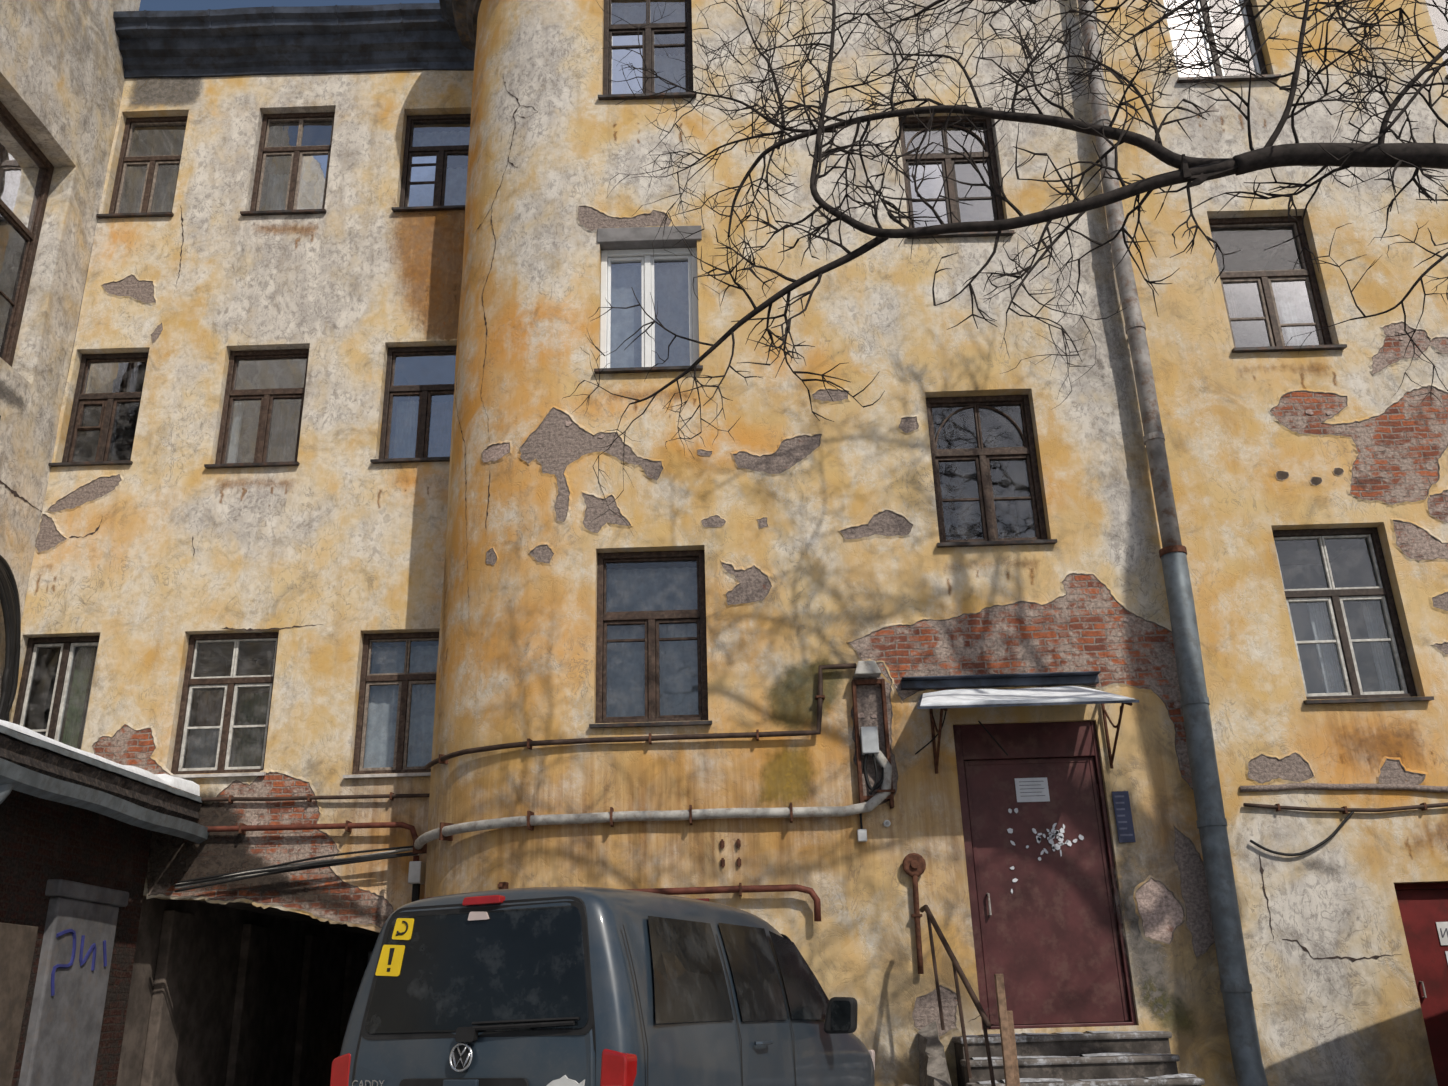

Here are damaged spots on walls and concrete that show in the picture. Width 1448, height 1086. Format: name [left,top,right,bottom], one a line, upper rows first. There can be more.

crack [454,78,538,603]
crack [0,480,42,512]
spalling [35,472,125,555]
spalling [480,406,665,536]
spalling [730,432,824,477]
spalling [838,508,916,543]
flaking render [1268,383,1448,563]
flaking render [846,570,1194,808]
flaking render [90,721,183,791]
leakage [761,748,810,803]
flaking render [145,769,396,930]
crack [1259,854,1400,962]